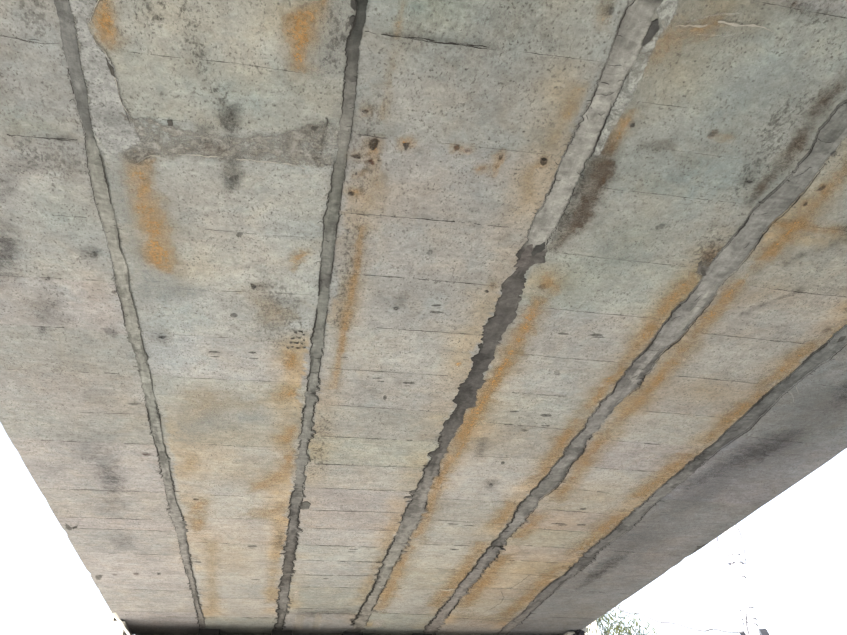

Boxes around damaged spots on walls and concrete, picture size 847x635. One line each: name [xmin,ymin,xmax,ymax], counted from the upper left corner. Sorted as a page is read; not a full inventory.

crack [7,69,205,627]
crack [272,0,502,631]
crack [526,0,635,245]
crack [424,102,847,630]
spalling [594,0,678,156]